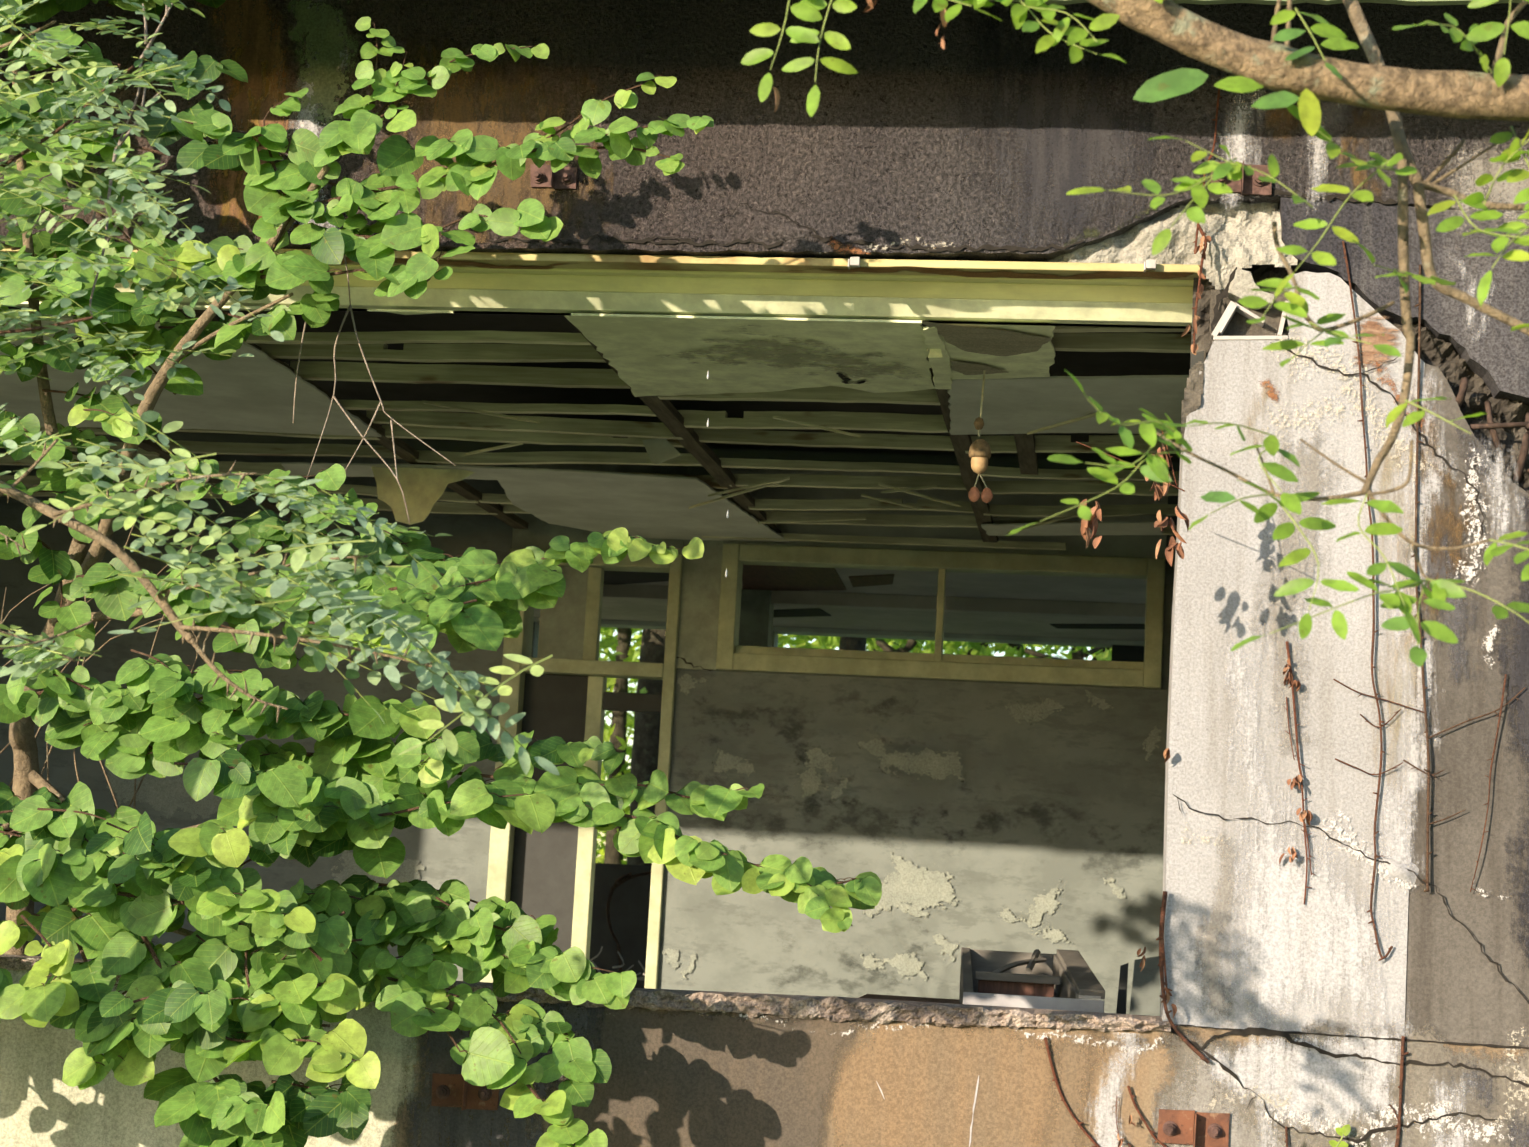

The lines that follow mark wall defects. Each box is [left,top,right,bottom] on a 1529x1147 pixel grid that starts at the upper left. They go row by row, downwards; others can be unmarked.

corrosion [198,0,298,232]
spalling [1181,361,1204,438]
spalling [1392,322,1529,494]
crack [1173,794,1529,1004]
crack [1171,1024,1529,1143]